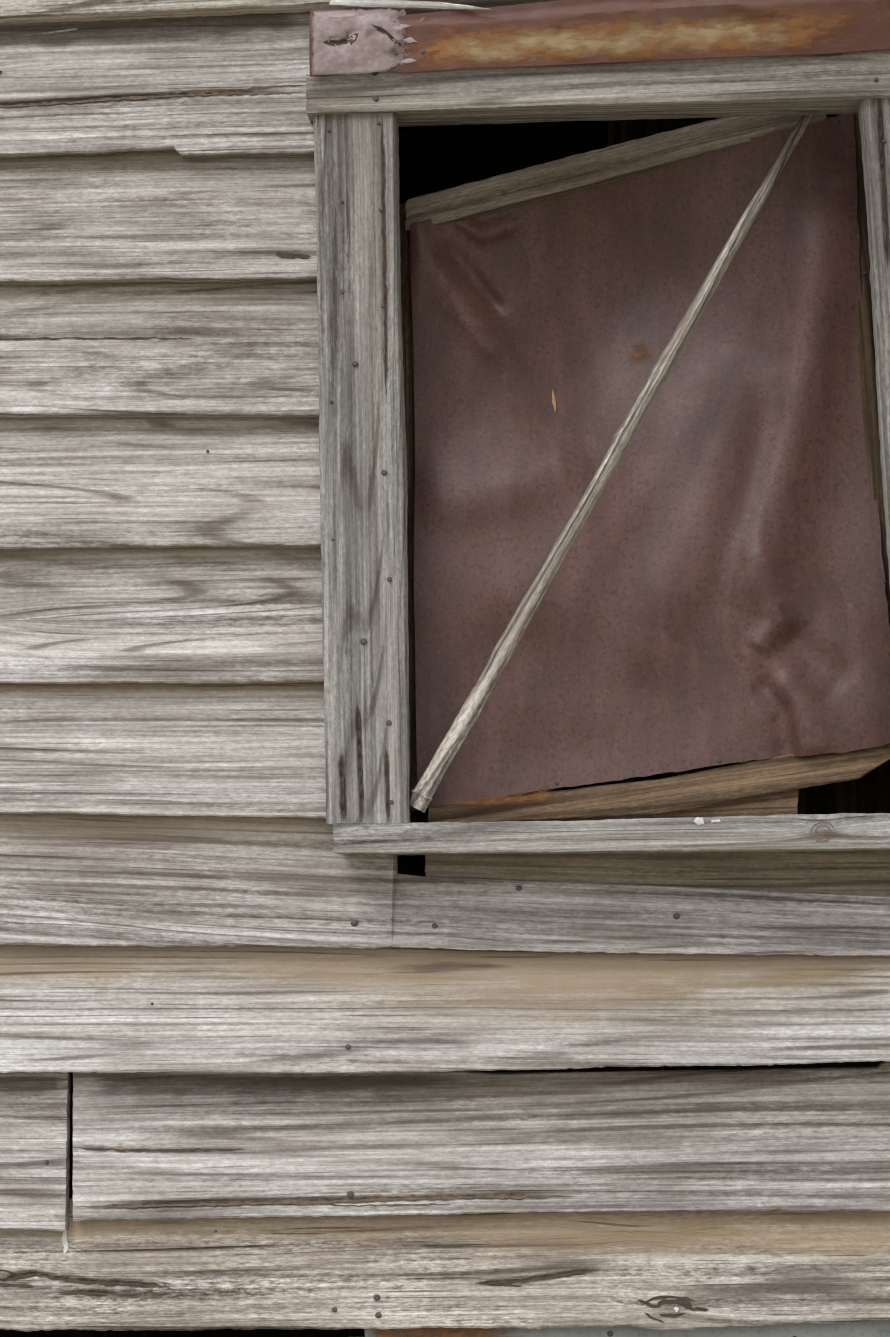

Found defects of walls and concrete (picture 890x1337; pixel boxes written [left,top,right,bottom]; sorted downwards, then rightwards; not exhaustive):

peeling [312,8,417,75]
corrosion [422,15,839,63]
corrosion [375,1327,506,1337]